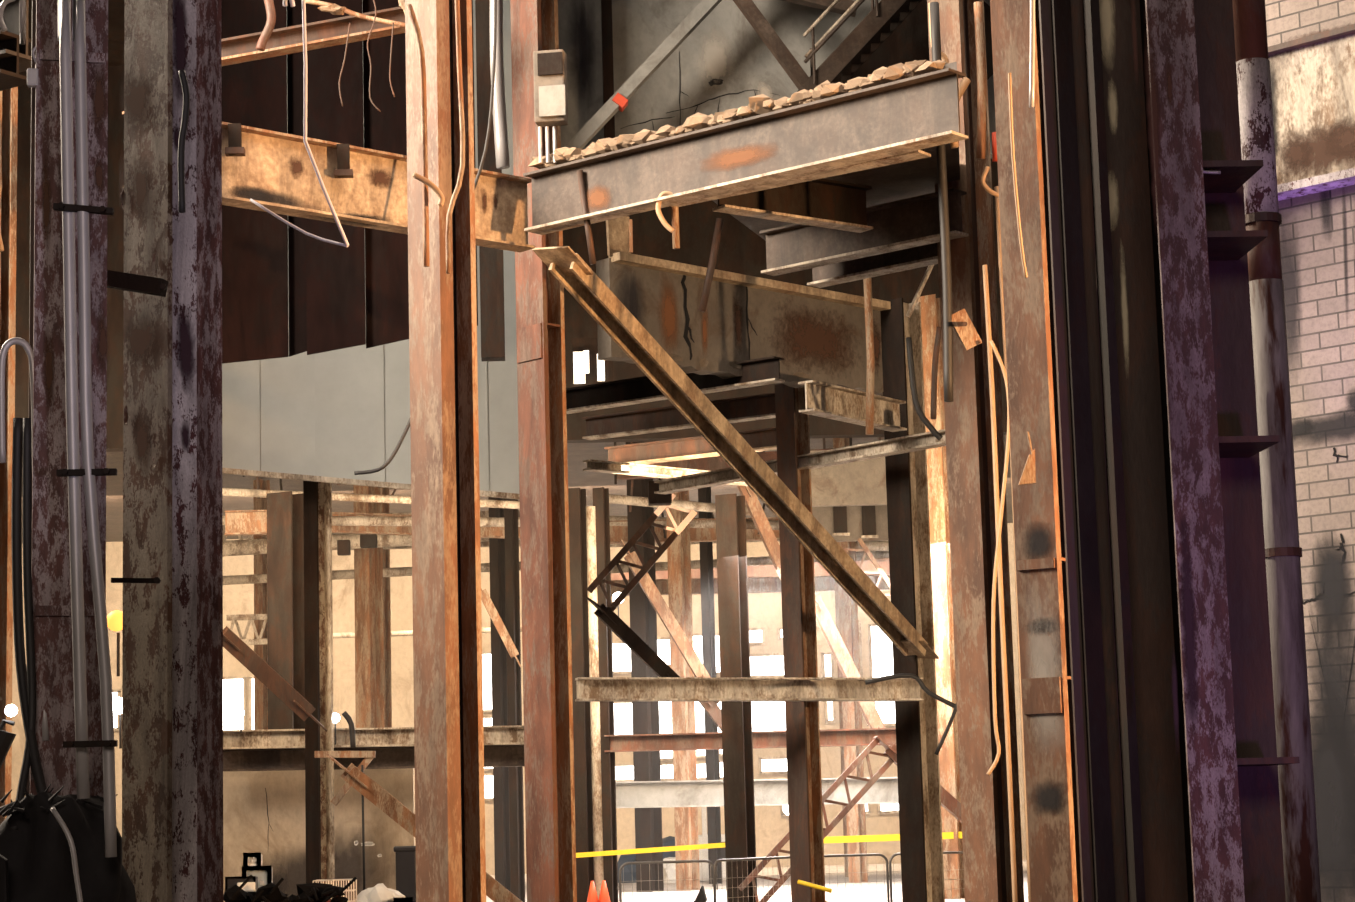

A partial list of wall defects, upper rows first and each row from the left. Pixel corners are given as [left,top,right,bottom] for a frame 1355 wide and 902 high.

corrosion [1132,0,1172,220]
corrosion [291,159,303,177]
corrosion [371,170,392,186]
corrosion [587,188,608,207]
corrosion [712,147,768,168]
corrosion [734,302,742,350]
corrosion [777,311,854,369]
corrosion [134,415,150,468]